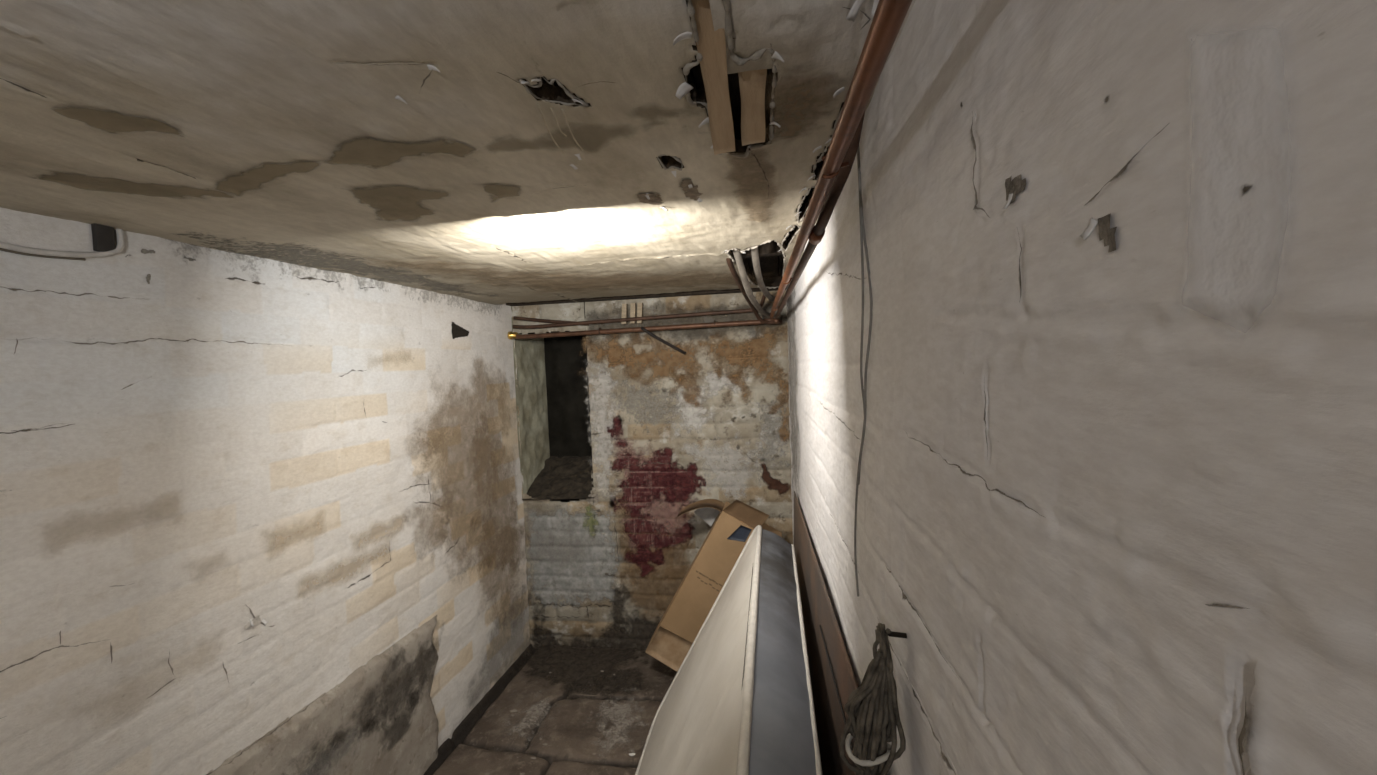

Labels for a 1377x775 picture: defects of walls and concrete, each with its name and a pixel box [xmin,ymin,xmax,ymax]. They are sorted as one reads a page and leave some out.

peeling [846,0,879,22]
peeling [675,82,693,99]
leakage [53,107,180,135]
leakage [39,138,476,198]
leakage [350,186,448,221]
leakage [485,185,520,201]
crack [1205,602,1249,610]
leakage [359,644,438,744]